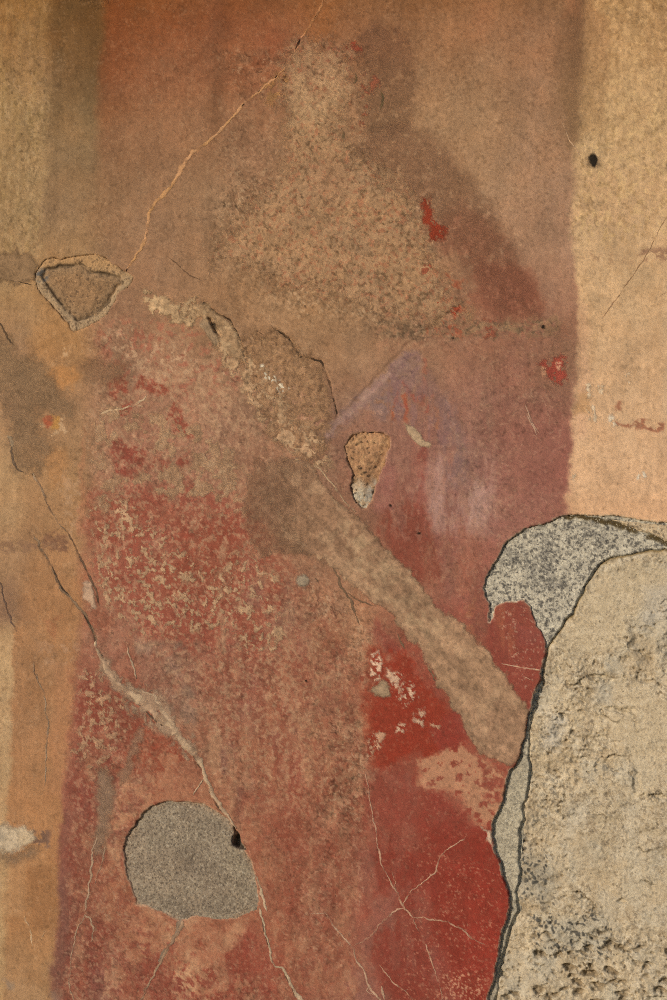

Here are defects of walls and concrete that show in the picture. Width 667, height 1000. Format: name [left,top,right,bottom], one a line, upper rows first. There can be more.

crack [126,0,323,272]
flaking render [36,254,133,332]
flaking render [143,290,210,327]
crack [171,259,324,366]
flaking render [214,330,333,472]
flaking render [345,432,390,508]
crack [7,435,236,828]
flaking render [484,515,667,1000]
crack [68,833,106,1000]
flaking render [125,801,259,920]
crack [255,874,303,1000]
crack [315,772,485,1000]